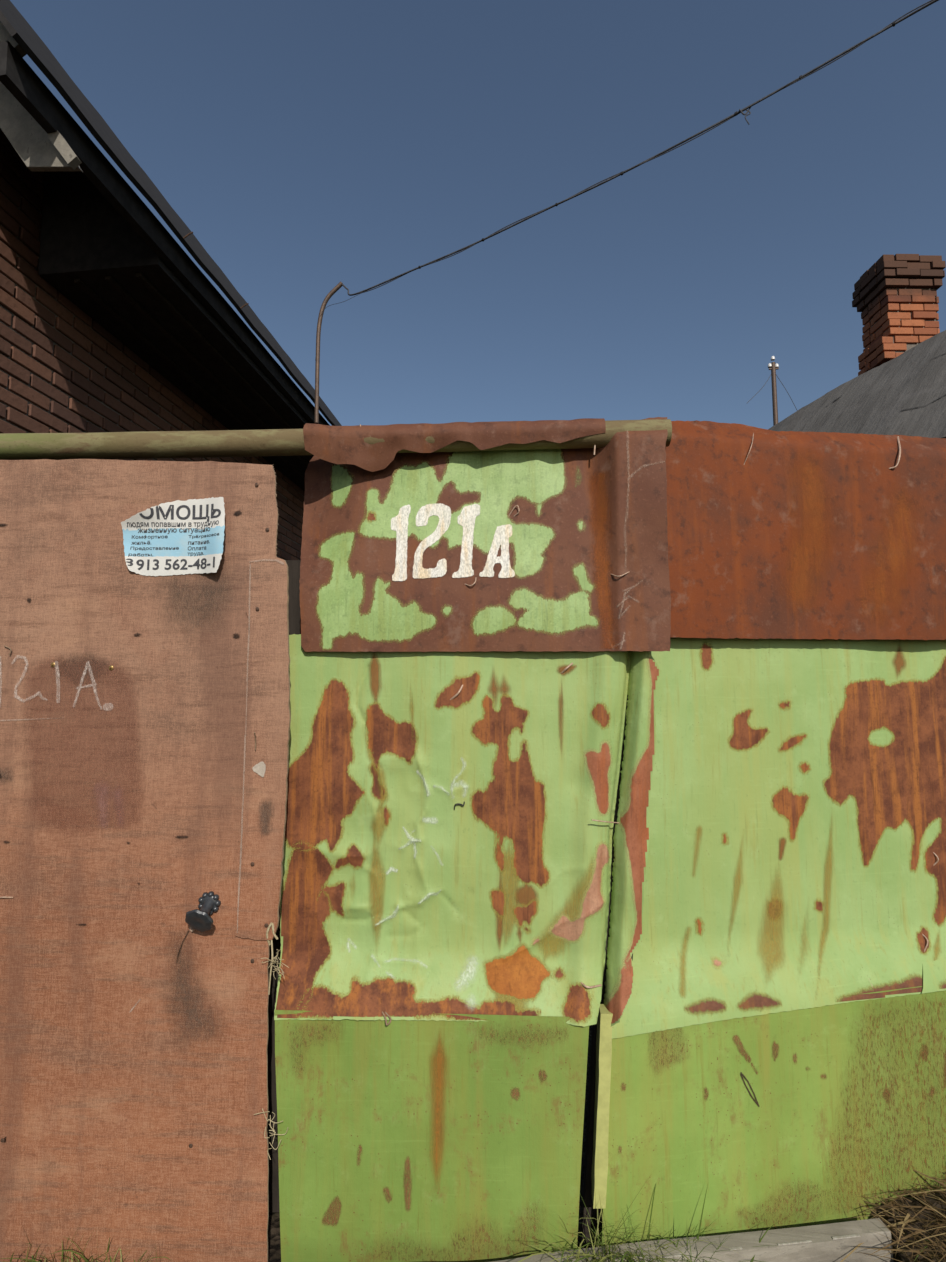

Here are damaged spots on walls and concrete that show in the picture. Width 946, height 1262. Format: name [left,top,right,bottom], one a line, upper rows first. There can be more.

corrosion [729,709,768,751]
corrosion [779,734,806,751]
corrosion [276,653,659,1070]
corrosion [772,787,809,859]
corrosion [815,843,832,951]
corrosion [824,648,946,957]
corrosion [433,1044,444,1170]